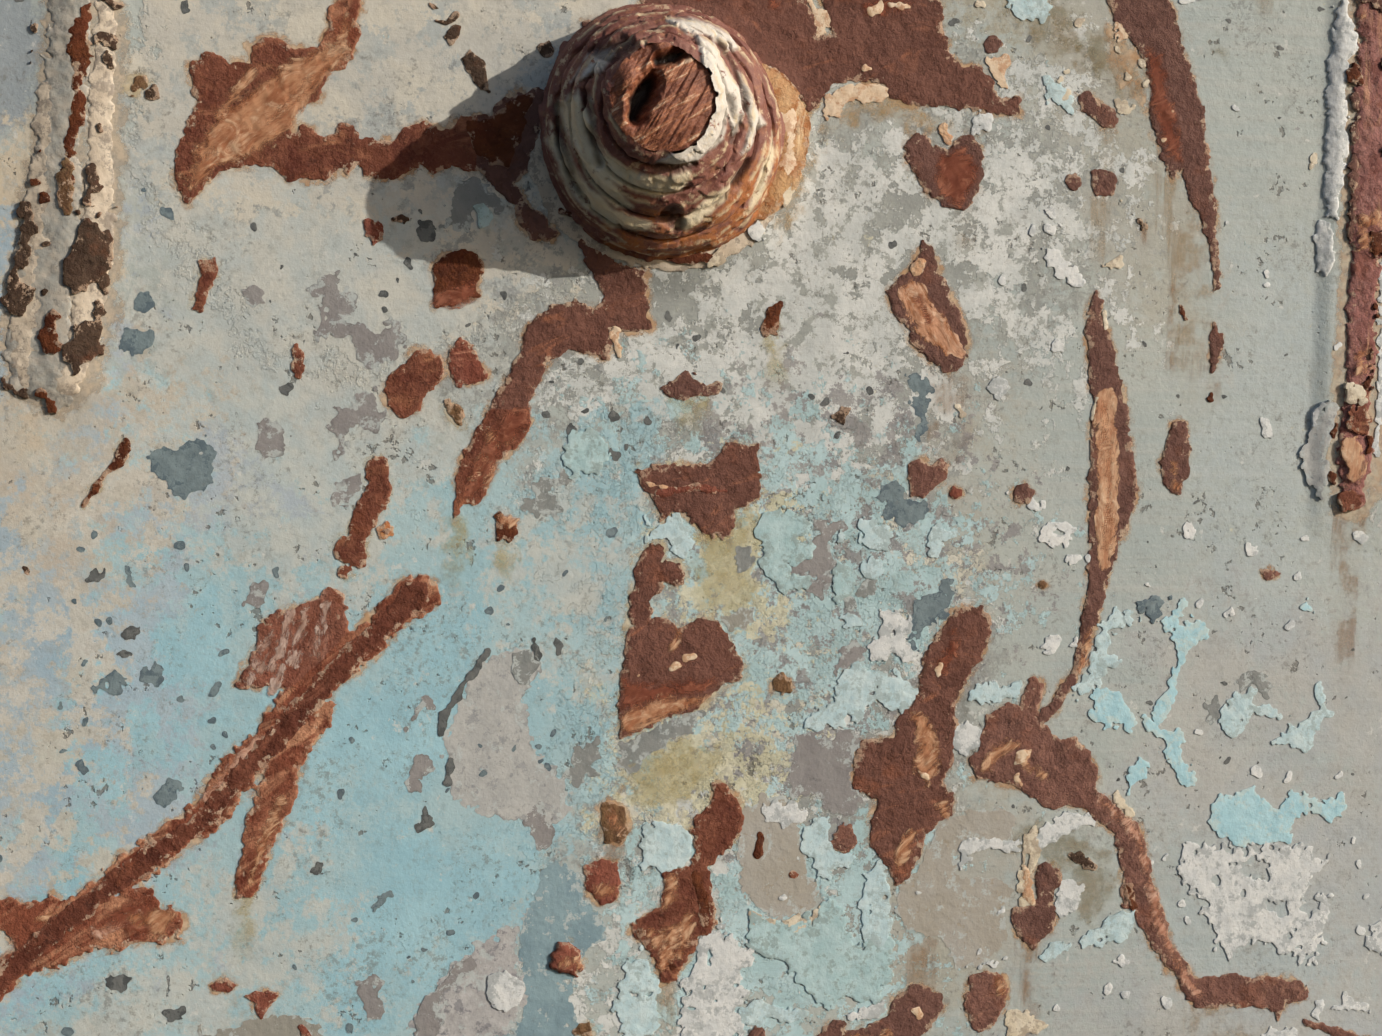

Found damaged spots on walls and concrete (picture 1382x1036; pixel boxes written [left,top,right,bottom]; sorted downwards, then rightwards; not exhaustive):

corrosion [171,0,572,245]
corrosion [637,0,1024,211]
corrosion [381,239,656,518]
peeling [904,373,935,442]
peeling [403,637,706,1036]
corrosion [616,539,747,740]
corrosion [626,780,764,988]
peeling [611,480,1096,1036]
corrosion [830,290,1309,1022]
peeling [1039,910,1135,968]
peeling [1177,785,1347,966]
peeling [1203,670,1335,753]